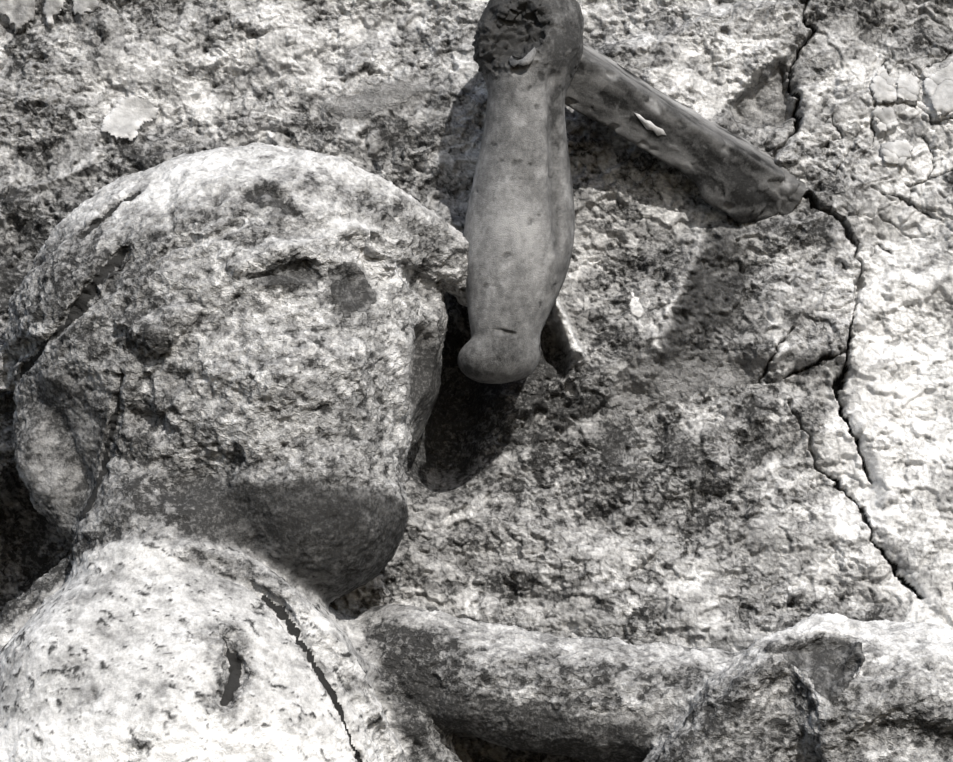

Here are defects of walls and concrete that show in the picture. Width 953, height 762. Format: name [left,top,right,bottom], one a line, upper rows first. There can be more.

crack [788,11,816,138]
crack [818,115,843,175]
crack [883,96,953,218]
crack [82,373,124,518]
crack [759,317,872,483]
crack [818,471,923,599]
crack [261,595,363,762]